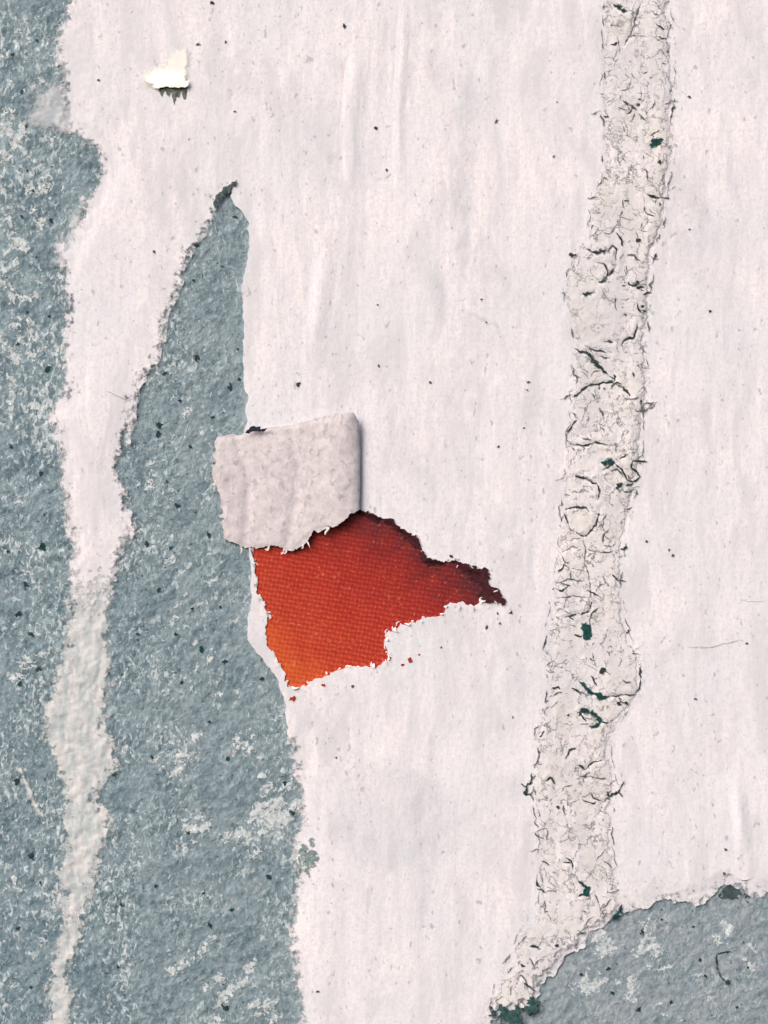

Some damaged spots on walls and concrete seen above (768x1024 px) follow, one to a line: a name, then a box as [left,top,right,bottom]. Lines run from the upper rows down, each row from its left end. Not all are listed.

peeling [0,107,53,405]
peeling [1,649,46,687]
peeling [70,186,307,1024]
crack [487,4,677,1017]
peeling [490,872,768,1024]